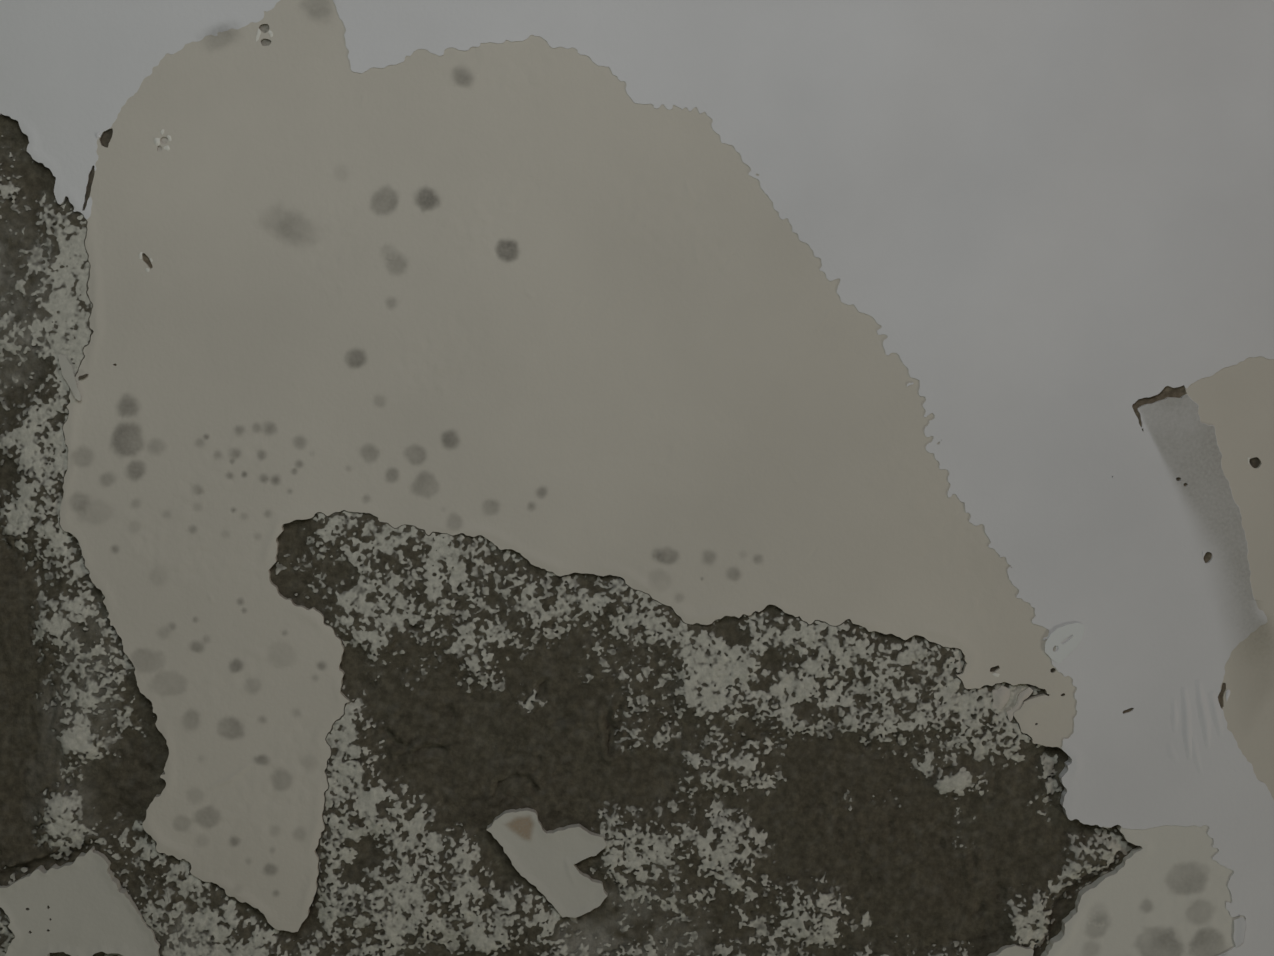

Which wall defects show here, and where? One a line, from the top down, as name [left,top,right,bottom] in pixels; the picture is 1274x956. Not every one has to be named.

spalling [0,114,182,956]
peeling [58,0,1085,932]
spalling [158,510,1246,956]
peeling [1183,356,1274,800]